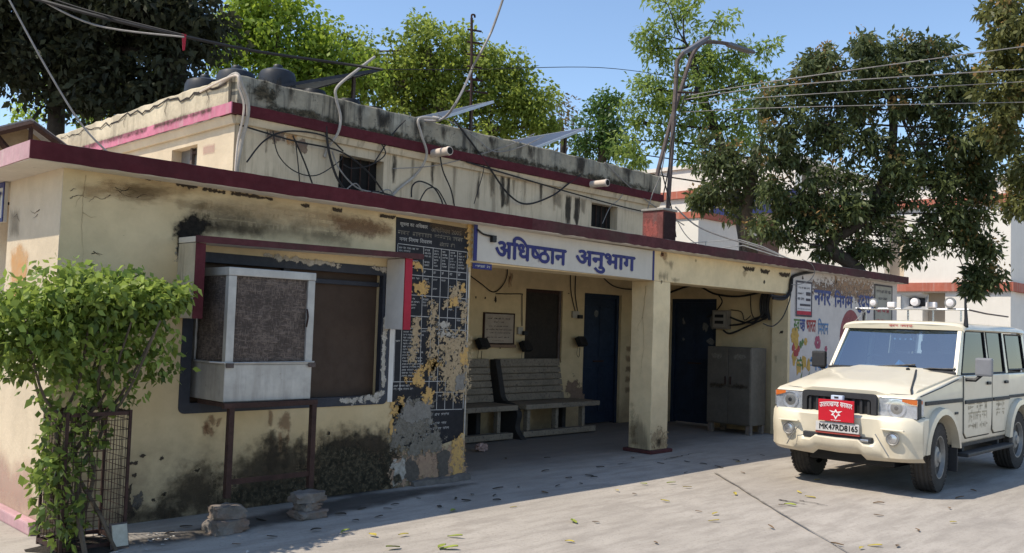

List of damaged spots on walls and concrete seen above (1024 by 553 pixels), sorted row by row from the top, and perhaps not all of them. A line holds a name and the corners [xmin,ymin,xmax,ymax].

damp [248,80,651,192]
crack [70,178,149,228]
damp [500,176,510,207]
damp [565,196,580,225]
peeling [263,253,342,269]
peeling [339,261,497,487]
damp [265,429,455,515]
damp [246,509,296,527]
damp [129,528,210,544]